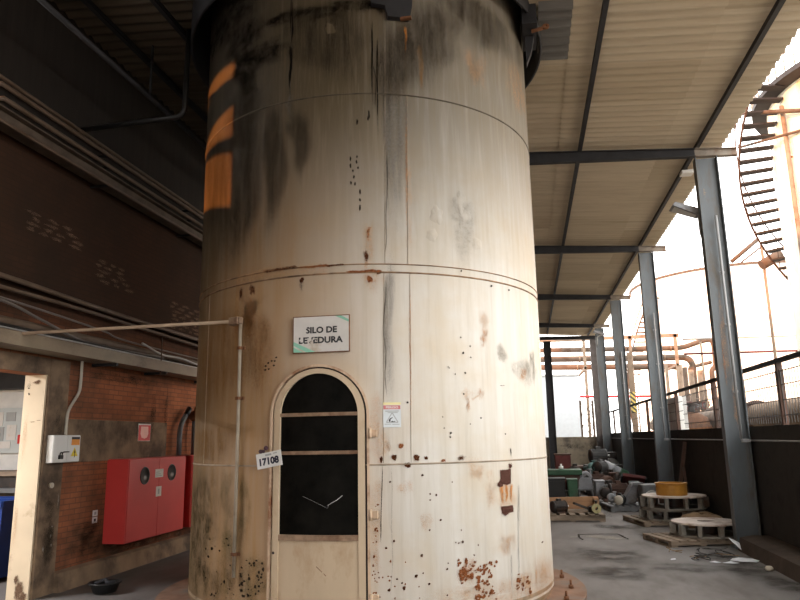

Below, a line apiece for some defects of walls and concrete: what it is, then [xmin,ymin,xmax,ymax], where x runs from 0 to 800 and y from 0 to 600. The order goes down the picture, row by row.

leakage [206,0,513,283]
rust [196,221,384,463]
leakage [382,253,396,400]
leakage [188,462,267,600]
rust [369,392,404,463]
rust [415,534,554,600]
rust [458,454,515,511]